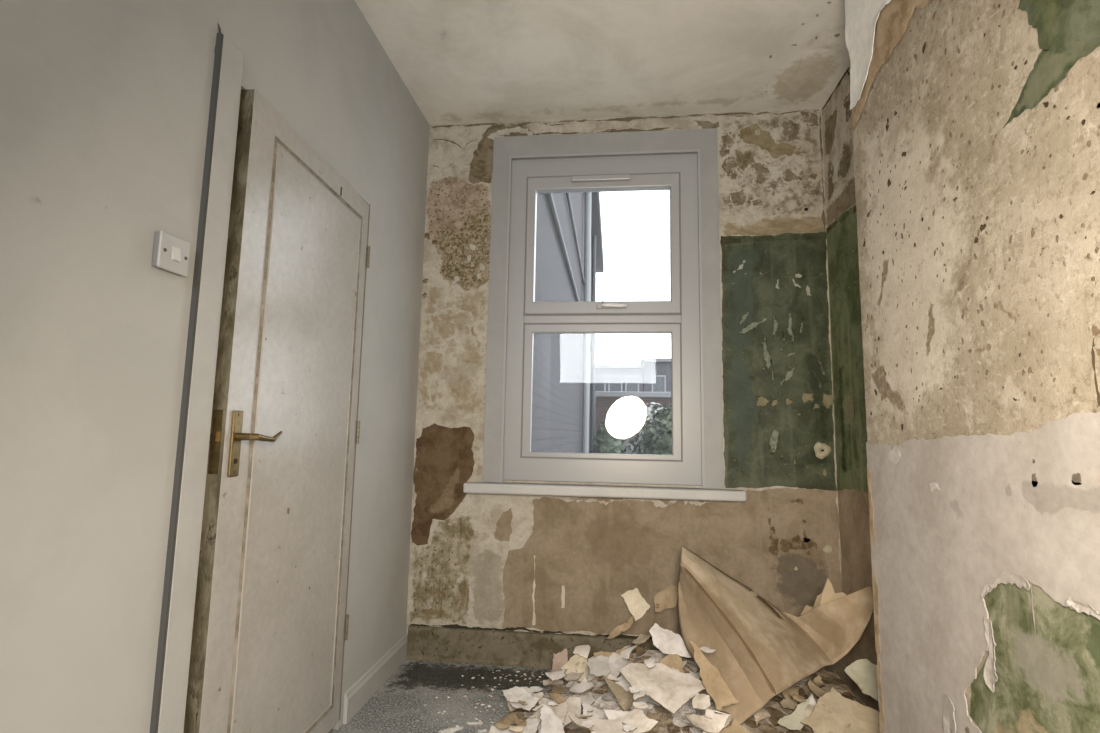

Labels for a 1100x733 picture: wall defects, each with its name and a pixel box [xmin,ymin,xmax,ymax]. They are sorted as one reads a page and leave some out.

spalling [1031,73,1100,126]
spalling [422,124,535,299]
peeling [695,73,1011,445]
flaking render [411,423,484,546]
flaking render [494,468,885,733]
spalling [943,572,1100,733]